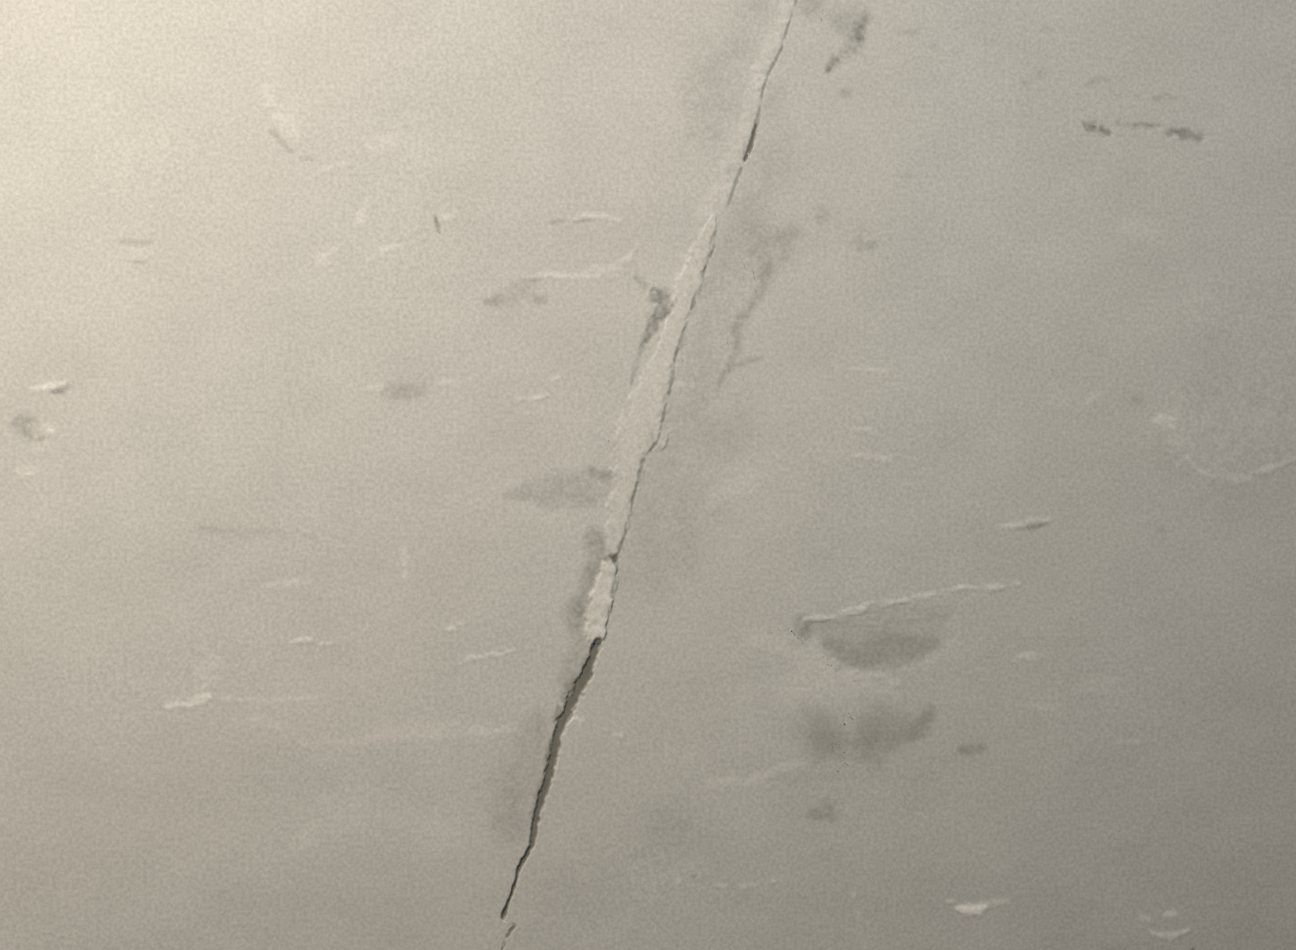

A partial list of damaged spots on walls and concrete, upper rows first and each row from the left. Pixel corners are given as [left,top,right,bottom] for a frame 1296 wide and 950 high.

crack [500,0,799,950]
leakage [784,690,942,779]